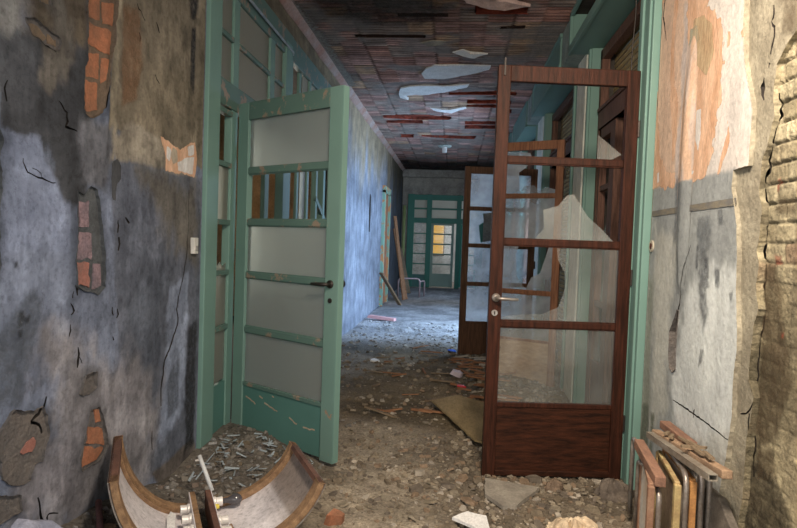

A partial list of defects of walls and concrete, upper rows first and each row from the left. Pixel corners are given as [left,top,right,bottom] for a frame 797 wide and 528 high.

flaking render [84,0,119,118]
flaking render [384,49,497,123]
peeling [653,0,730,190]
crack [761,5,775,101]
crack [23,158,56,183]
peeling [161,136,197,178]
crack [160,199,189,400]
water stain [696,221,719,318]
flaking render [719,0,797,528]
crack [741,315,766,415]
flaking render [0,406,50,525]
crack [673,400,728,440]